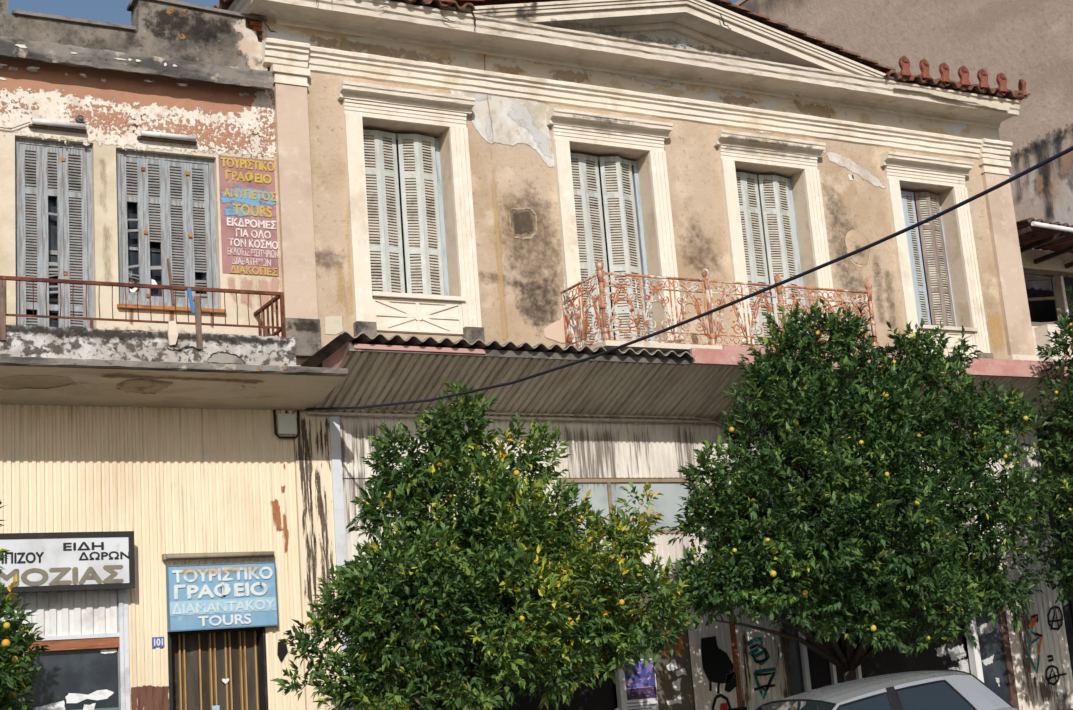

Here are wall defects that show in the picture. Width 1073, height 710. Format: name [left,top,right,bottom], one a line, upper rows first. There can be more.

damp [145,6,230,42]
peeling [0,64,276,162]
flaking render [449,90,555,168]
flaking render [823,149,886,189]
damp [1010,124,1071,219]
damp [512,203,548,257]